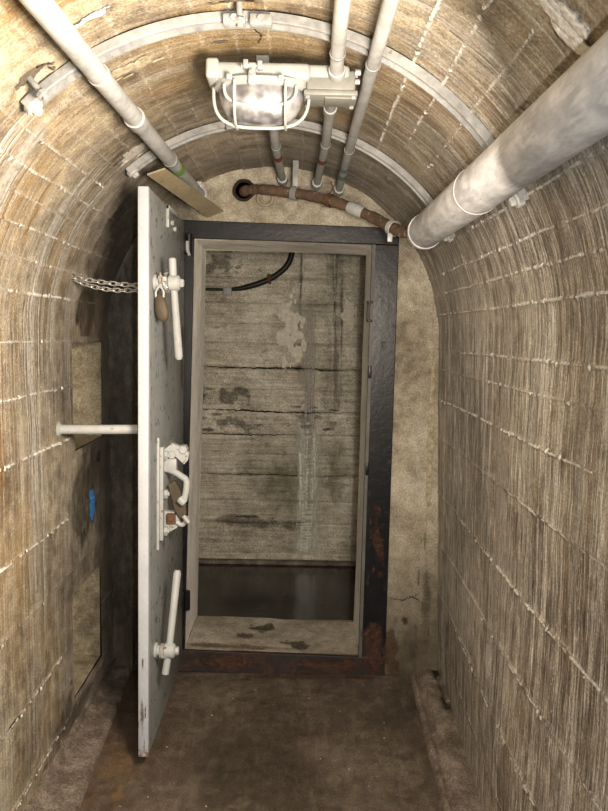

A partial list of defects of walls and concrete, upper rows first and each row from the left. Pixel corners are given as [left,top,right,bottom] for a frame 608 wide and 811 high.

efflorescence [379,77,435,148]
efflorescence [412,0,508,113]
efflorescence [532,0,590,56]
peeling [275,283,307,370]
efflorescence [296,311,318,553]
efflorescence [441,145,608,734]